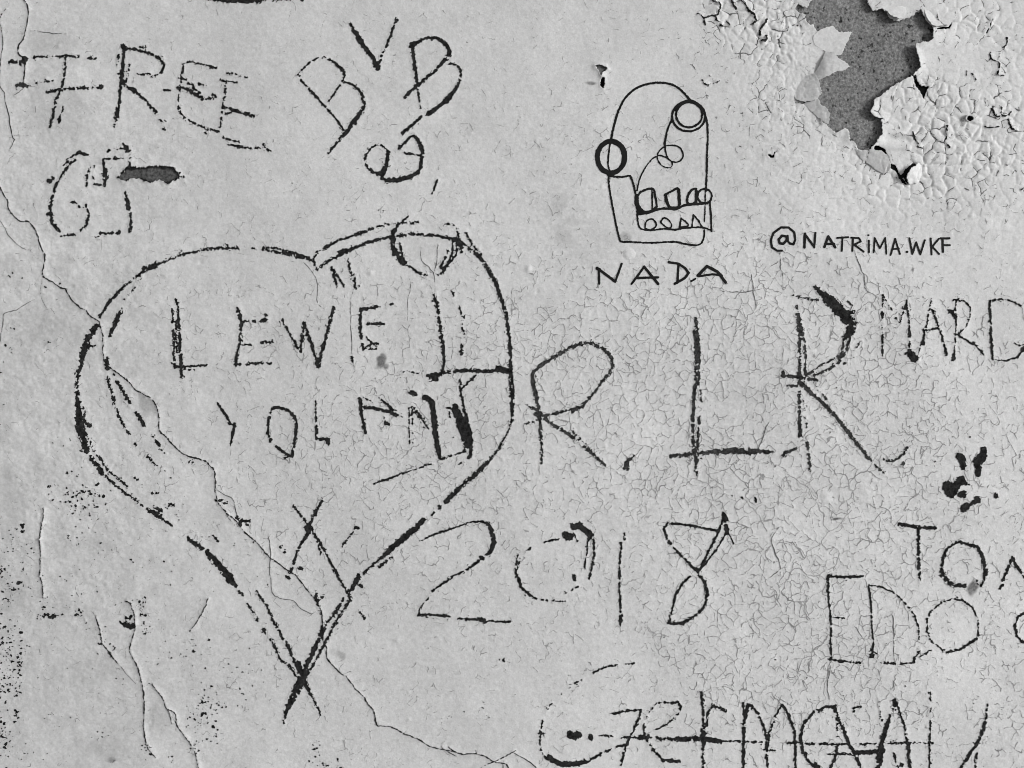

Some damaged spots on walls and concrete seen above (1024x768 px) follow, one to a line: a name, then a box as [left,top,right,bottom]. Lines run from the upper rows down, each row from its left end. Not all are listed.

peeling [777,0,957,185]
crack [984,106,1018,132]
spalling [117,165,185,184]
crack [722,253,783,305]
crack [0,187,536,768]